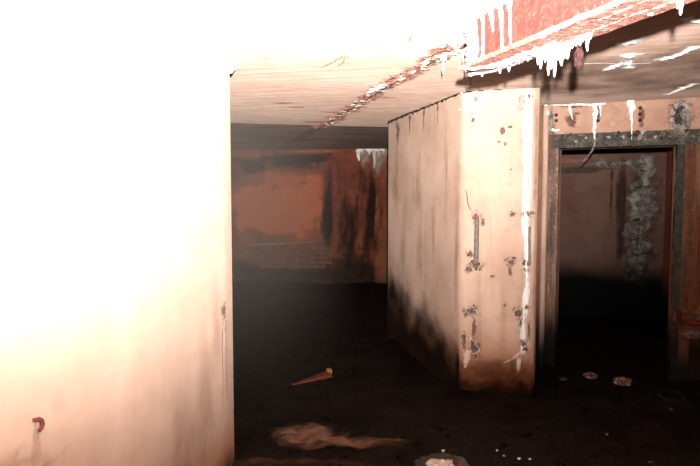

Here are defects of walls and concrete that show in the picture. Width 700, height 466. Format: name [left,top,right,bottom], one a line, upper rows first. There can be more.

water stain [464,0,512,62]
water stain [553,103,606,120]
spalling [668,98,695,138]
water stain [231,155,326,173]
water stain [356,149,388,170]
spalling [464,211,485,273]
spalling [504,226,532,276]
water stain [503,88,538,370]
spalling [462,303,480,360]
spalling [503,303,531,351]